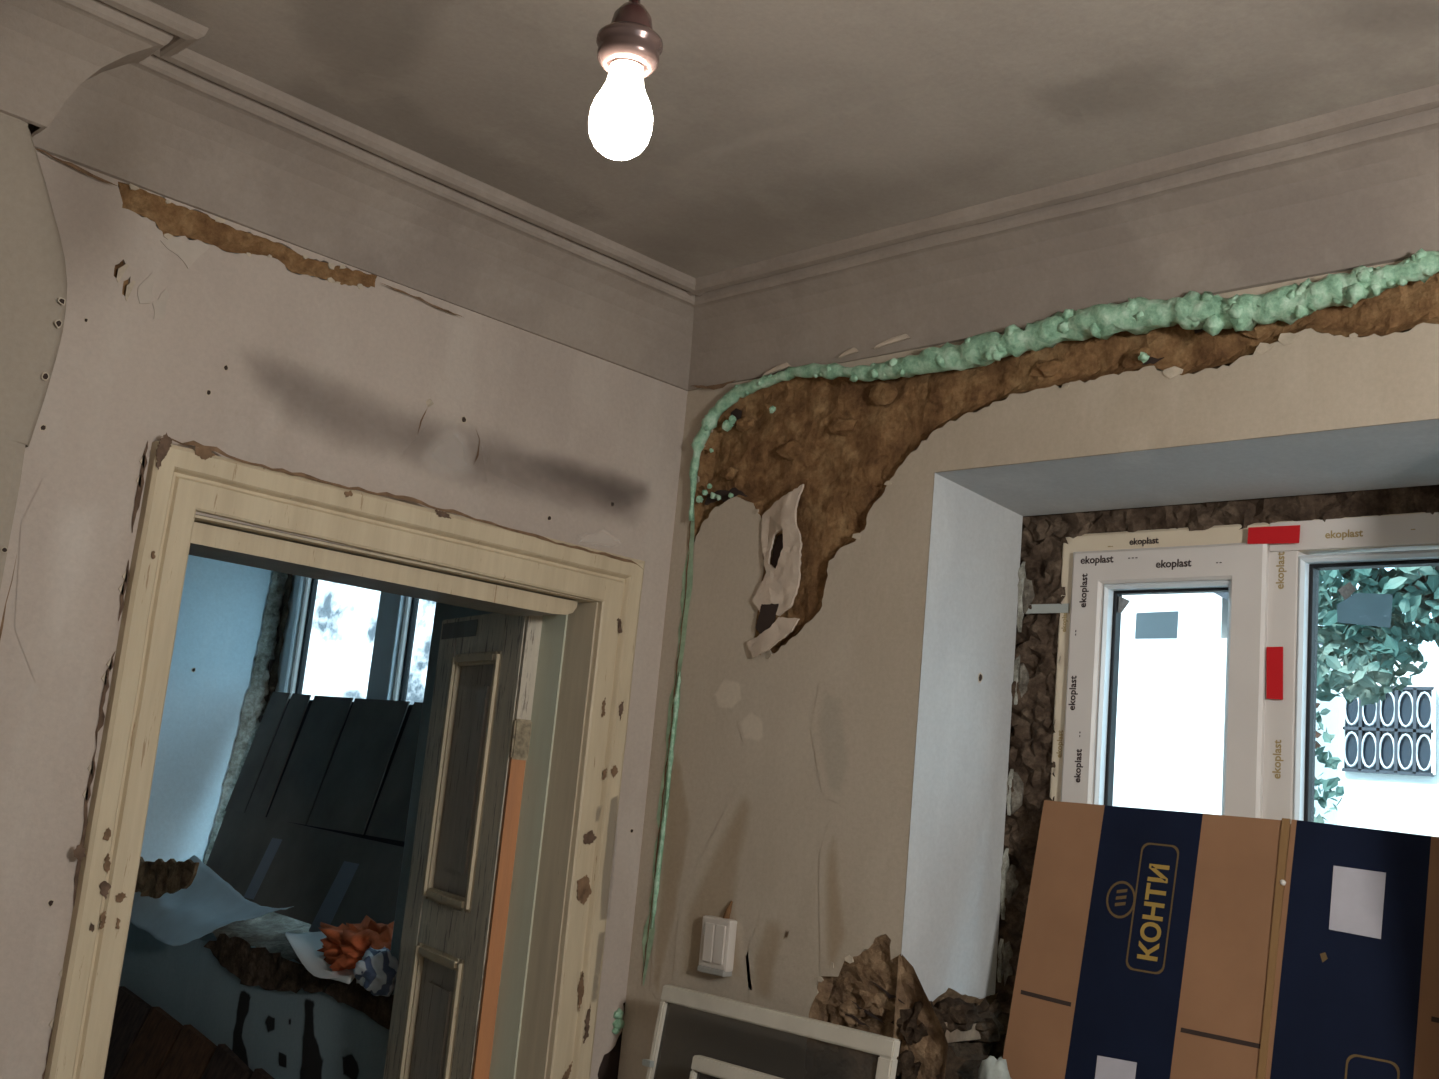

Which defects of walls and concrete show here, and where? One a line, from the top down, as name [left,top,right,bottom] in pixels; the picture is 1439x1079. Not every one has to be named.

flaking render [118,182,377,289]
flaking render [694,272,1439,659]
flaking render [809,516,1069,1079]